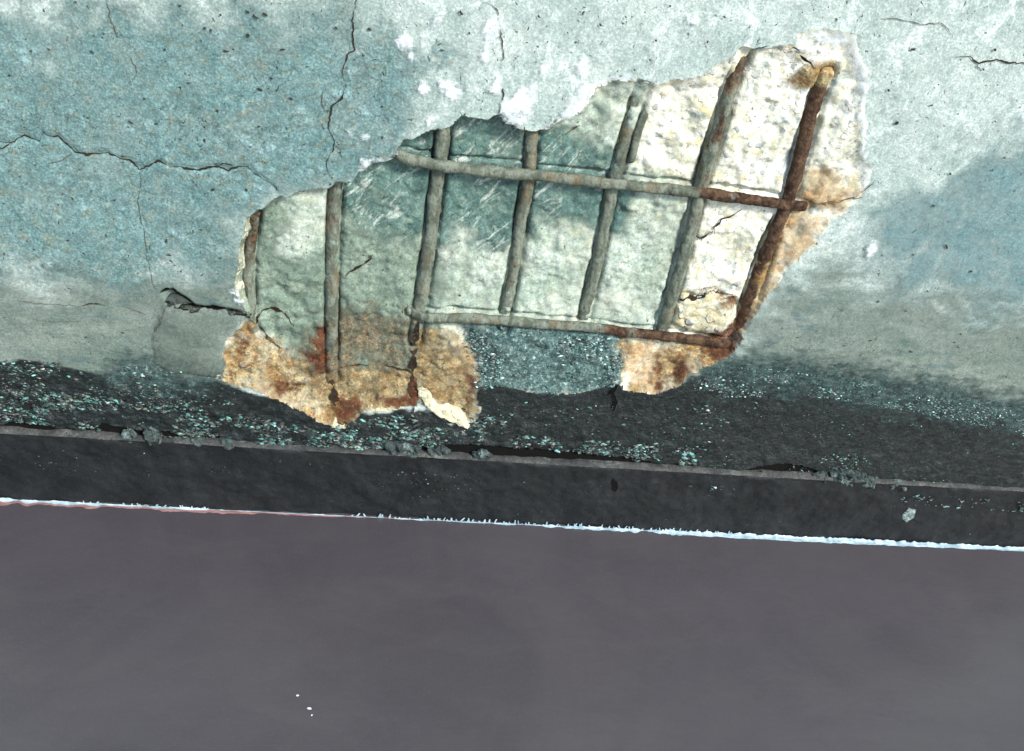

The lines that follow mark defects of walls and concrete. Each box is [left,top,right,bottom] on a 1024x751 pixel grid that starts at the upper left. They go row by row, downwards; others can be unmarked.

crack [321,0,357,175]
corrosion [787,60,836,88]
crack [0,131,294,349]
spalling [222,195,296,360]
spalling [314,181,349,355]
corrosion [221,301,480,426]
crack [344,257,372,280]
spalling [357,28,873,429]
corrosion [617,170,862,394]